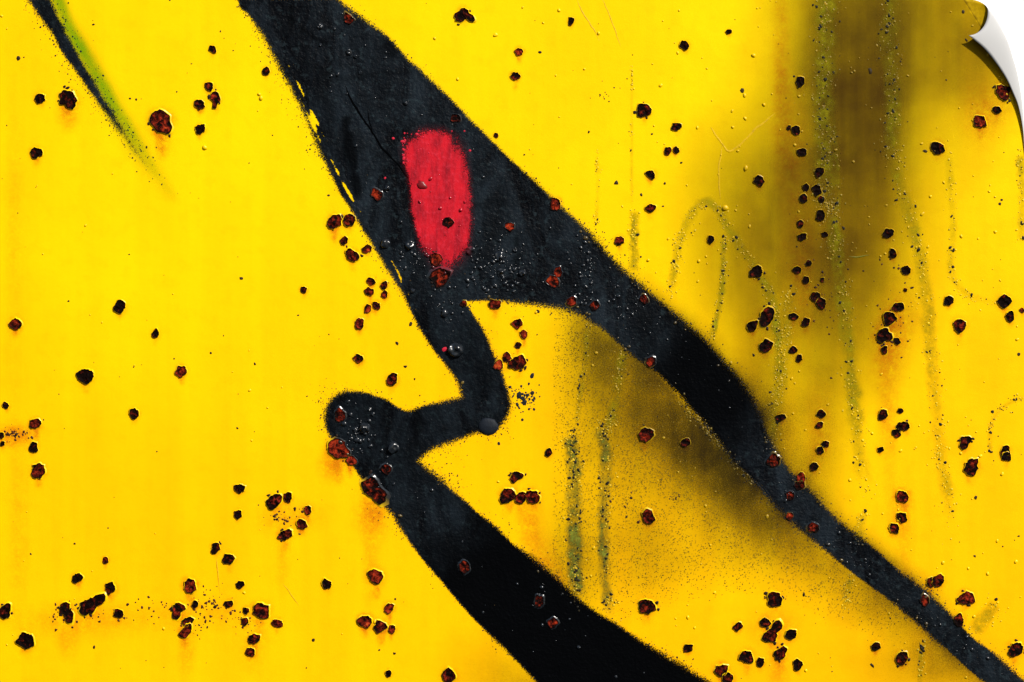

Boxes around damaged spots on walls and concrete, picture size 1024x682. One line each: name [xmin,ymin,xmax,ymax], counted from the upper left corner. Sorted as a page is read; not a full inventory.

peeling [964,0,1024,149]